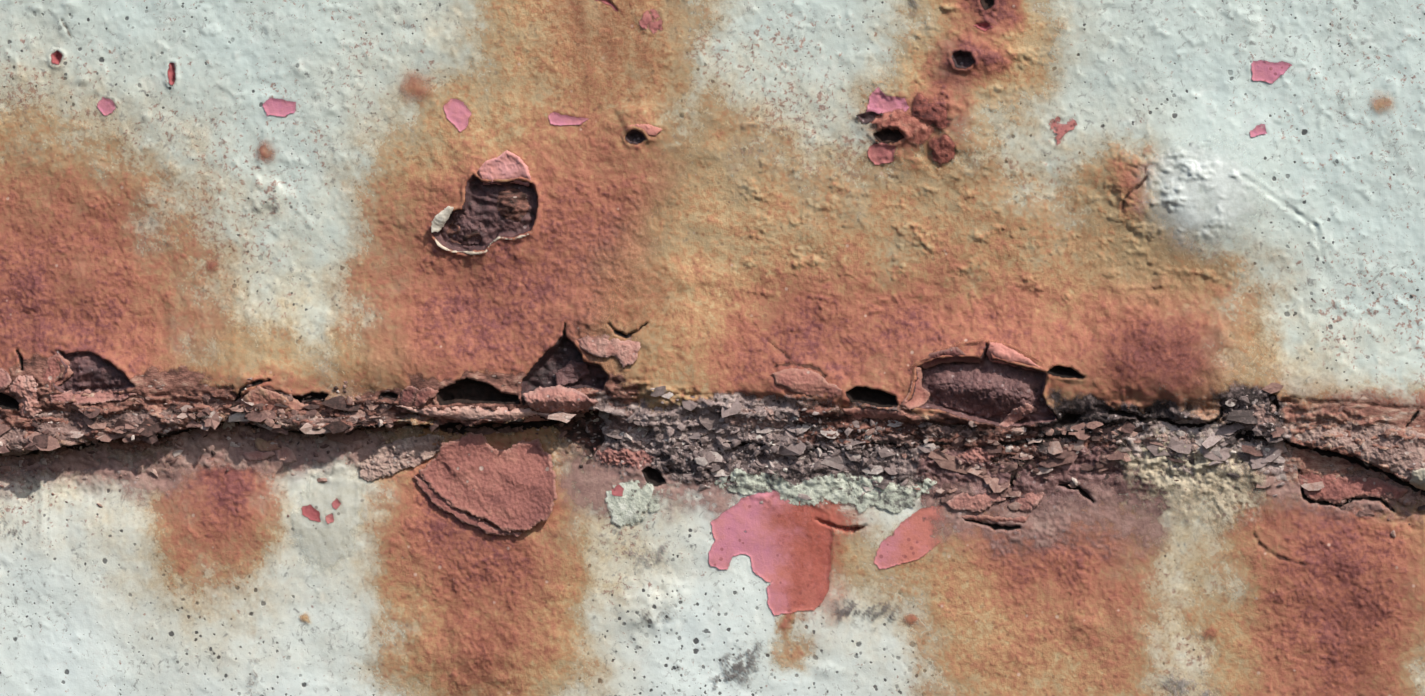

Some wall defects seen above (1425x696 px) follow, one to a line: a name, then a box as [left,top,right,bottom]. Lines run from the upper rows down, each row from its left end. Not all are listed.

peeling [868,143,896,165]
peeling [856,87,910,124]
peeling [577,335,641,368]
corrosion [0,0,1280,598]
peeling [243,438,297,463]
corrosion [366,420,736,696]
peeling [709,490,833,616]
peeling [874,506,940,569]
corrosion [788,452,1166,696]
corrosion [1181,386,1425,696]